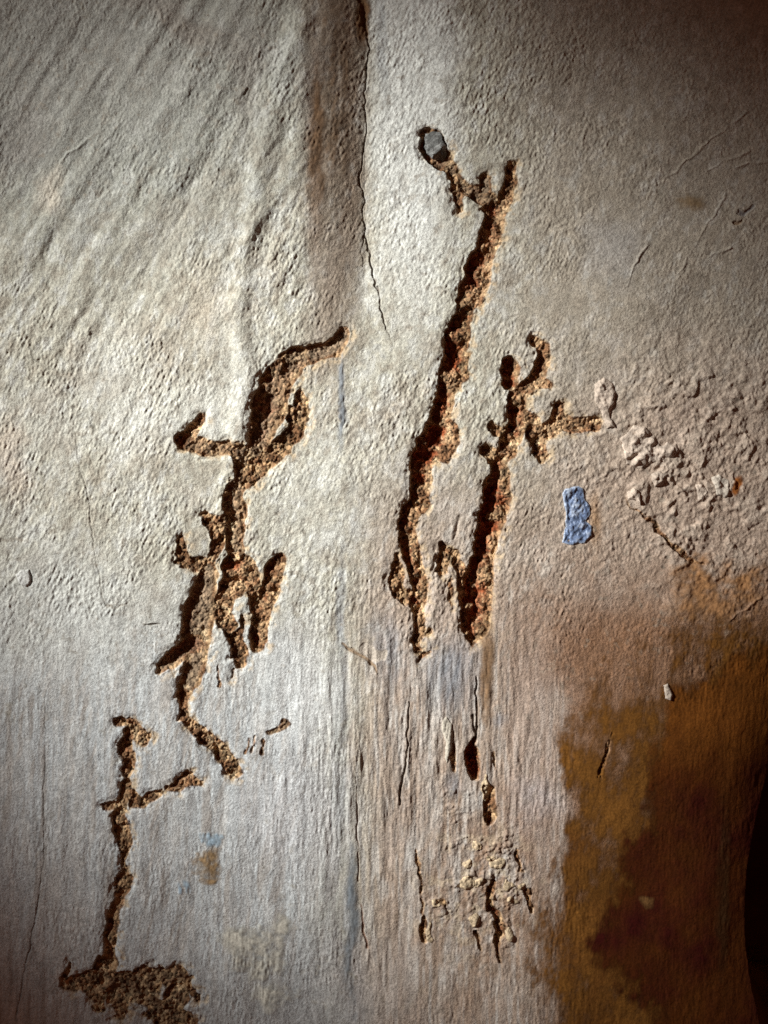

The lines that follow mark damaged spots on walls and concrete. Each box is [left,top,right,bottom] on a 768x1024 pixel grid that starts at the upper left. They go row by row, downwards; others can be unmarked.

crack [355,0,392,346]
spalling [215,663,224,691]
spalling [442,717,498,782]
water stain [526,613,768,1024]
hole [418,914,429,945]
spalling [434,896,449,909]
hole [472,877,509,966]
spalling [513,848,536,915]